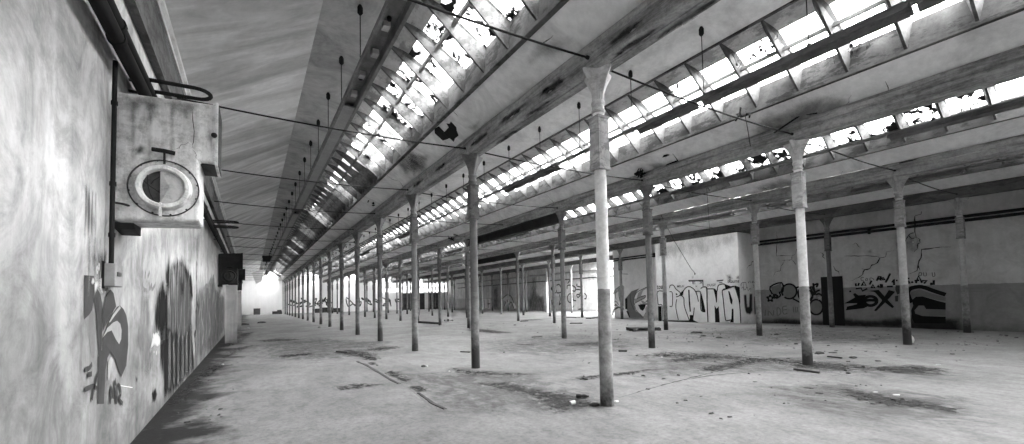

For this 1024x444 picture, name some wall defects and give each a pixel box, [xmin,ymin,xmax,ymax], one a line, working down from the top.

crack [747,211,940,281]